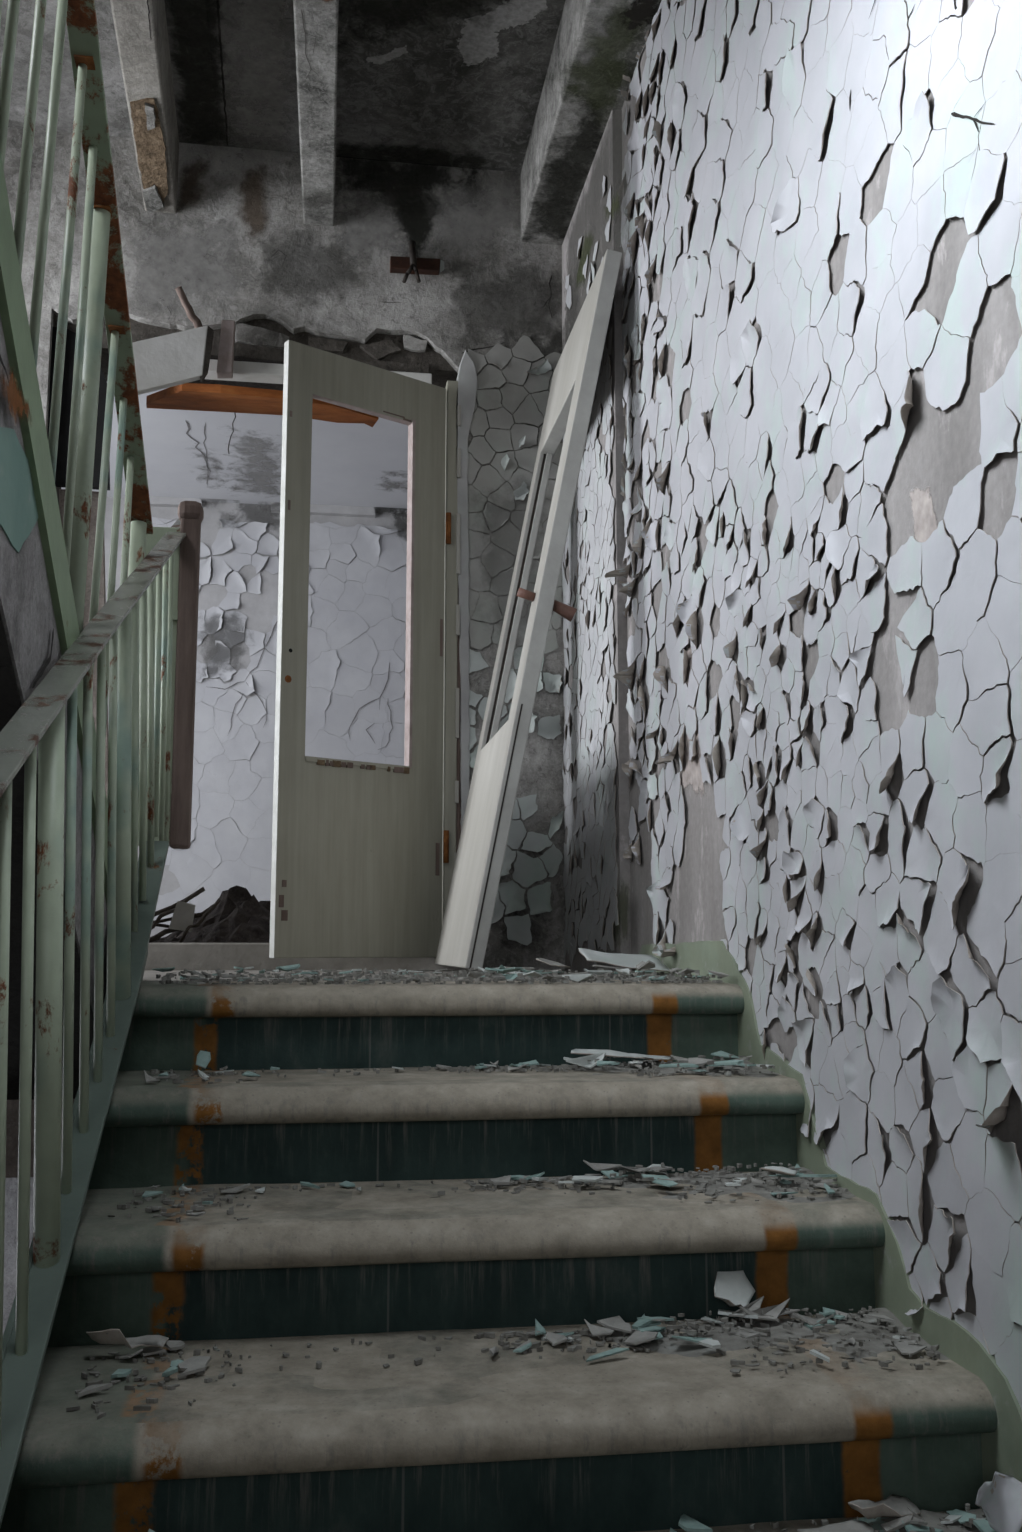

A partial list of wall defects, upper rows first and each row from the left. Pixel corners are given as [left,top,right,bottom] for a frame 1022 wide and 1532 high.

water stain [179,162,208,208]
water stain [340,169,521,257]
peeling [152,517,177,527]
peeling [305,522,407,766]
peeling [154,519,288,926]
peeling [468,647,523,769]
peeling [491,0,1022,1410]
peeling [797,1494,921,1532]
peeling [975,1471,1022,1532]